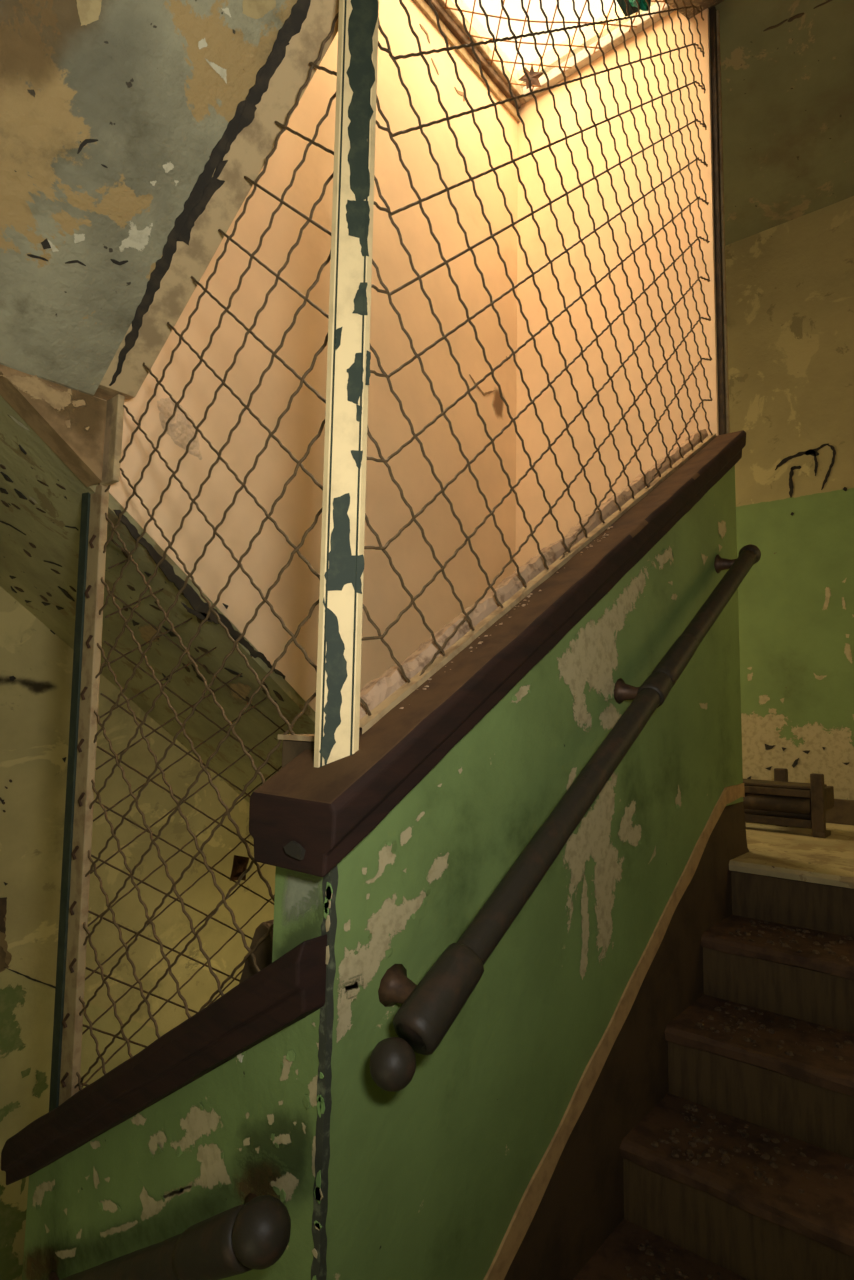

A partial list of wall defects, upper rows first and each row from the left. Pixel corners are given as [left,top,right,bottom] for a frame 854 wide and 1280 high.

peeling [566,767,577,790]
peeling [741,694,854,800]
spalling [0,882,12,972]
peeling [336,812,450,1043]
peeling [562,772,656,980]
peeling [85,1050,318,1238]